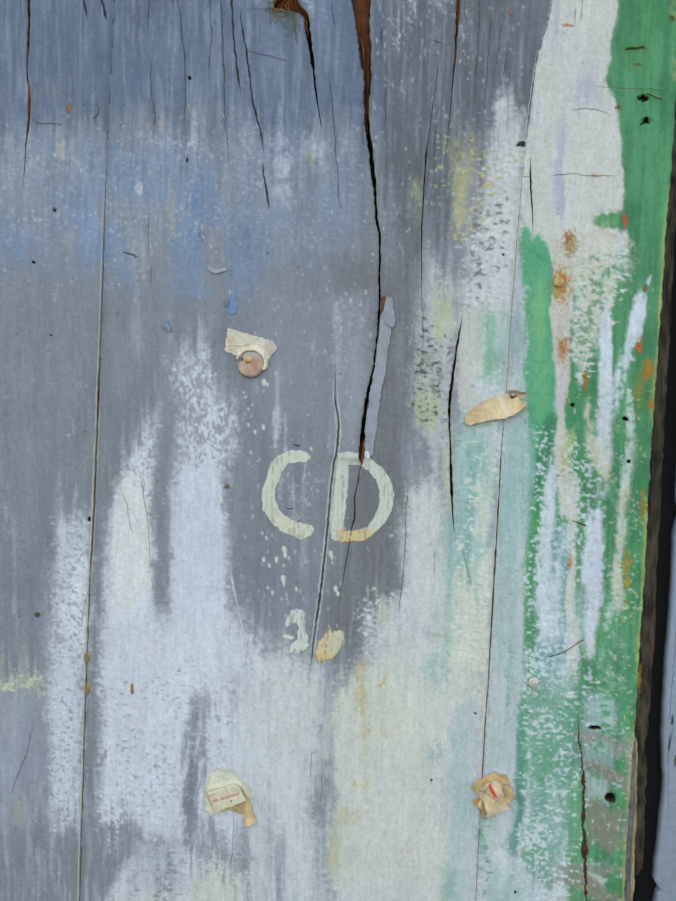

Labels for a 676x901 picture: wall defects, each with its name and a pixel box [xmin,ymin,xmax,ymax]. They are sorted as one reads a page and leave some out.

crack [23,0,31,182]
crack [209,0,269,207]
crack [270,0,321,121]
crack [307,0,386,675]
crack [448,320,462,532]
rust [550,229,578,305]
crack [577,707,589,901]